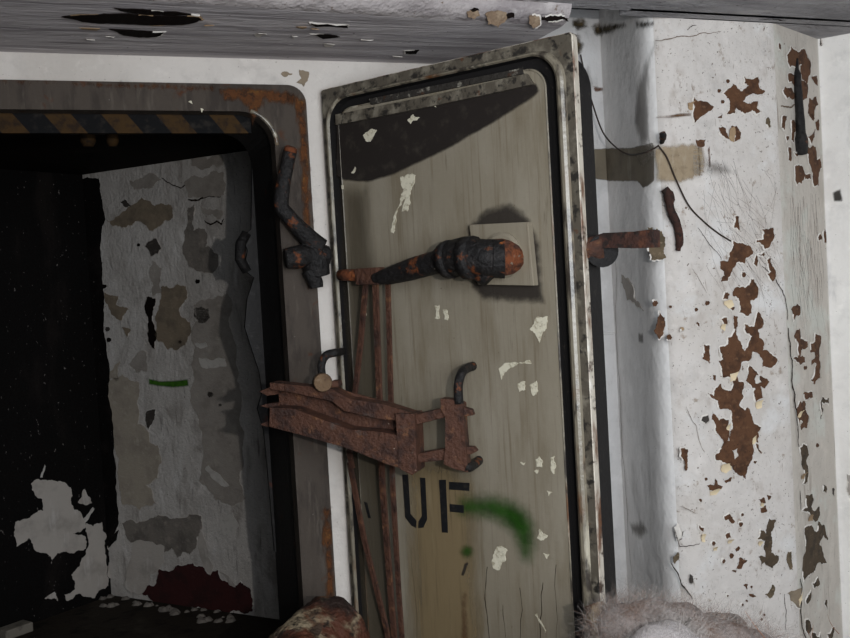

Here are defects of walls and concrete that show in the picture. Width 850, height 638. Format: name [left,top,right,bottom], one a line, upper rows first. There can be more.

spalling [62,8,214,40]
corrosion [210,86,311,226]
peeling [391,173,416,233]
peeling [647,227,666,262]
peeling [671,42,822,188]
peeling [13,154,254,614]
peeling [652,299,685,341]
peeling [698,215,778,504]
peeling [791,304,829,430]
peeling [679,446,689,471]
peeling [799,443,819,485]
peeling [740,485,835,613]